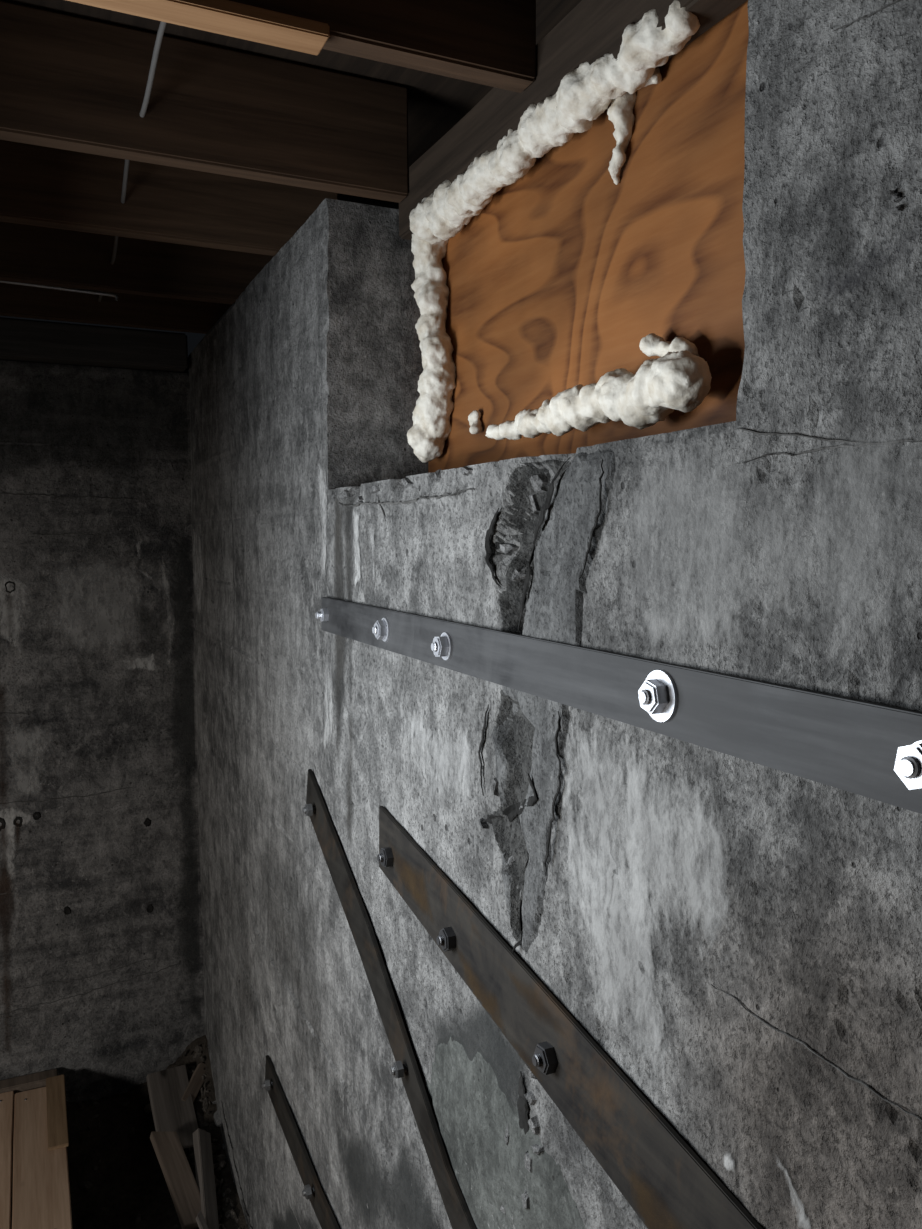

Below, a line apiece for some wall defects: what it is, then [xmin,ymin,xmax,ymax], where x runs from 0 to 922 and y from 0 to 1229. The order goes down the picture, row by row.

crack [711,984,922,1121]